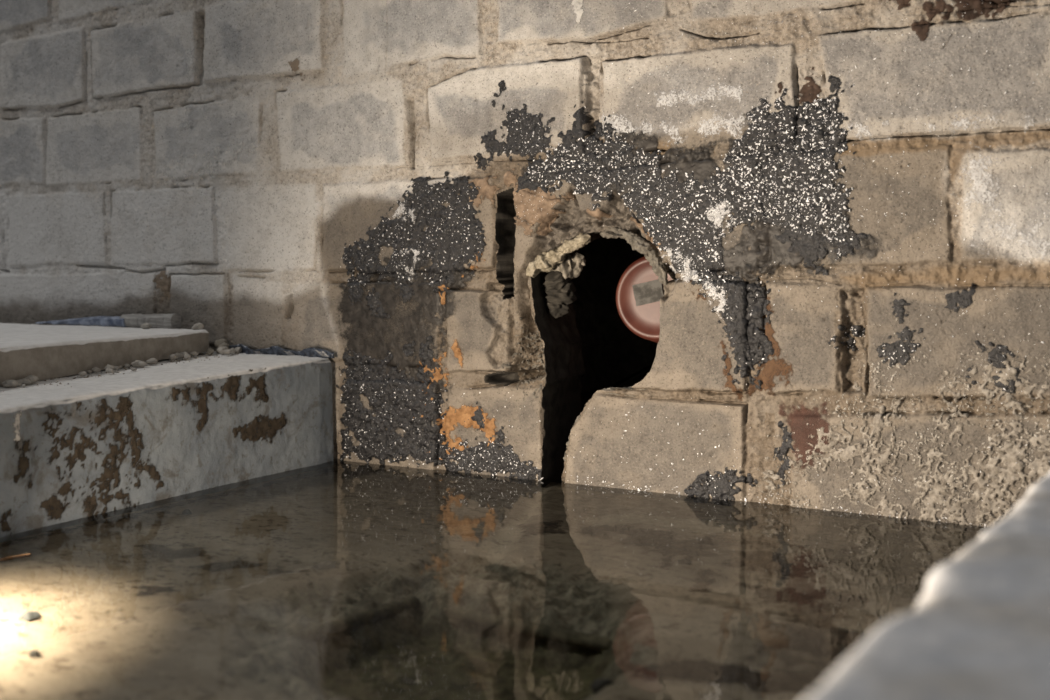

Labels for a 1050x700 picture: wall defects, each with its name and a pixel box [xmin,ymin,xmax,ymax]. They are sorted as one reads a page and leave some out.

corrosion [413,339,463,418]
corrosion [429,405,496,460]
spalling [468,167,685,487]
water stain [517,514,868,693]